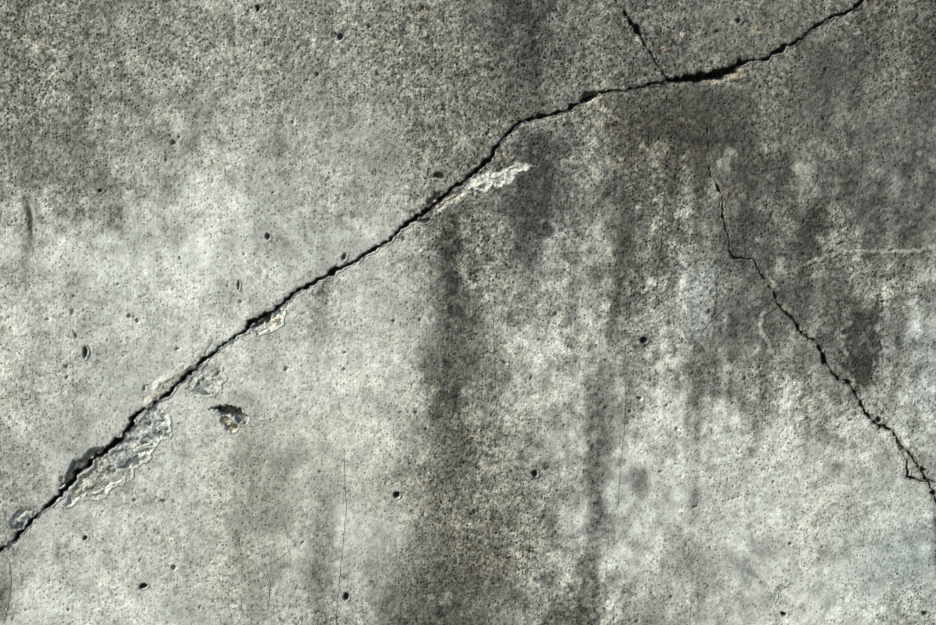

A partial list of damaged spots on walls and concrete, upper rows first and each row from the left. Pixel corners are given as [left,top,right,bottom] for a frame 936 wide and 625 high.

crack [0,100,585,553]
leakage [359,200,530,625]
spalling [425,150,536,217]
leakage [479,0,575,323]
crack [592,99,651,154]
leakage [542,88,884,625]
crack [578,0,867,104]
crack [704,106,936,505]
crack [728,557,790,625]